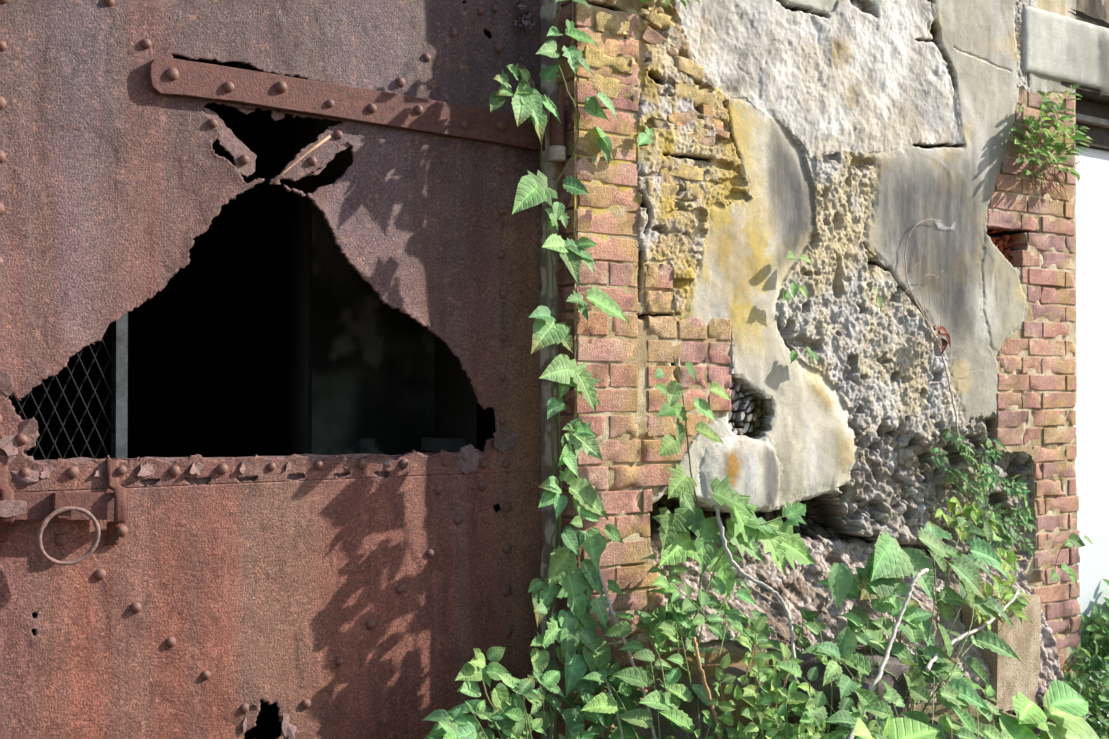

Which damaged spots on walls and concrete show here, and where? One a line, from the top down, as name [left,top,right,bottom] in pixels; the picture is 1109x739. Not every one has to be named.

crack [776,0,830,18]
crack [915,0,1012,90]
crack [662,99,741,162]
crack [912,142,964,150]
damp [886,175,975,330]
flaking render [583,0,1037,696]
corrosion [0,417,58,486]
corrosion [137,463,155,477]
corrosion [0,500,27,518]
spalling [1024,609,1064,706]
spalling [909,679,947,705]
corrosion [281,713,297,739]